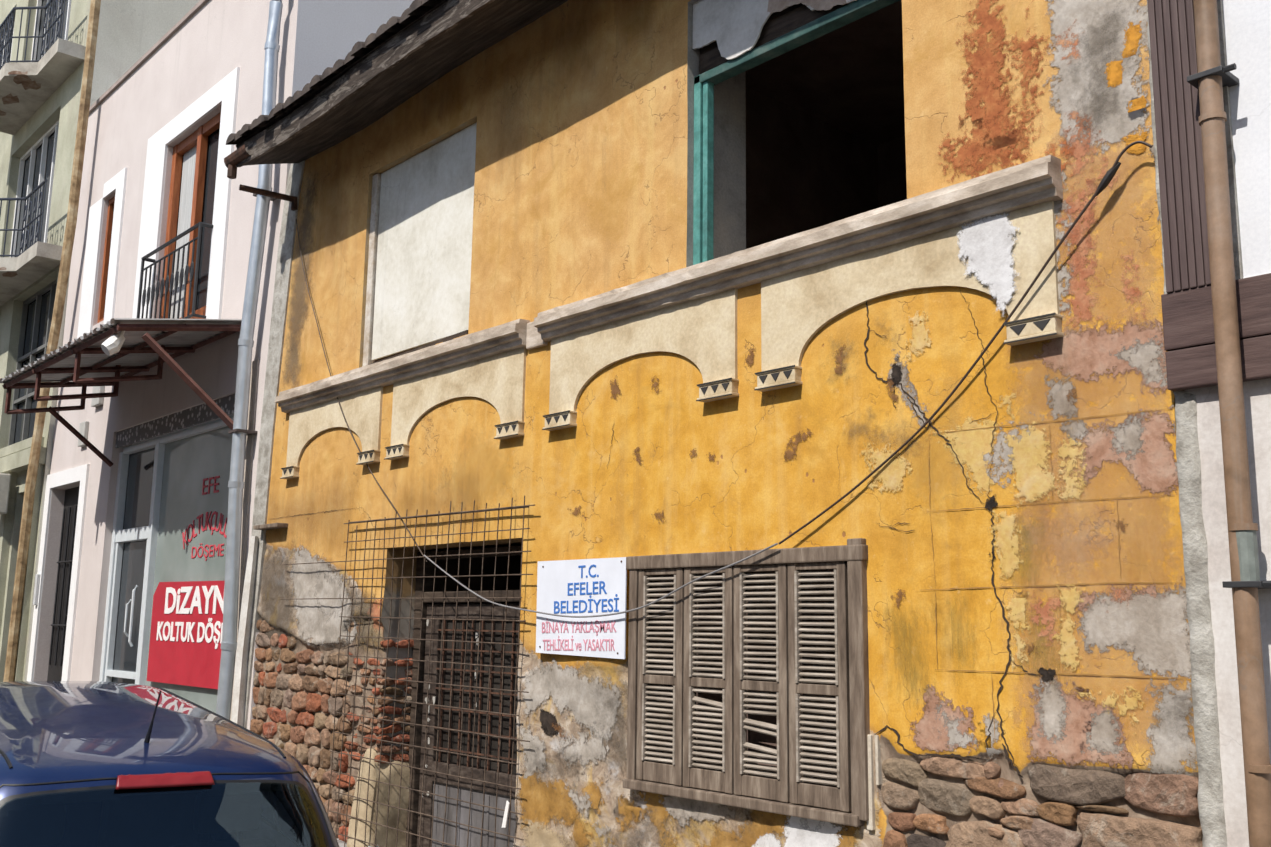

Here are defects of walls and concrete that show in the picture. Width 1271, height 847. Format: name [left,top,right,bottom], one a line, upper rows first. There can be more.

peeling [767,0,847,13]
peeling [883,0,1179,579]
peeling [859,443,912,493]
crack [864,287,1056,778]
flaking render [314,569,436,763]
peeling [517,709,678,847]
peeling [696,810,821,847]
peeling [836,825,861,847]
peeling [910,684,1001,761]
flaking render [1004,576,1198,776]